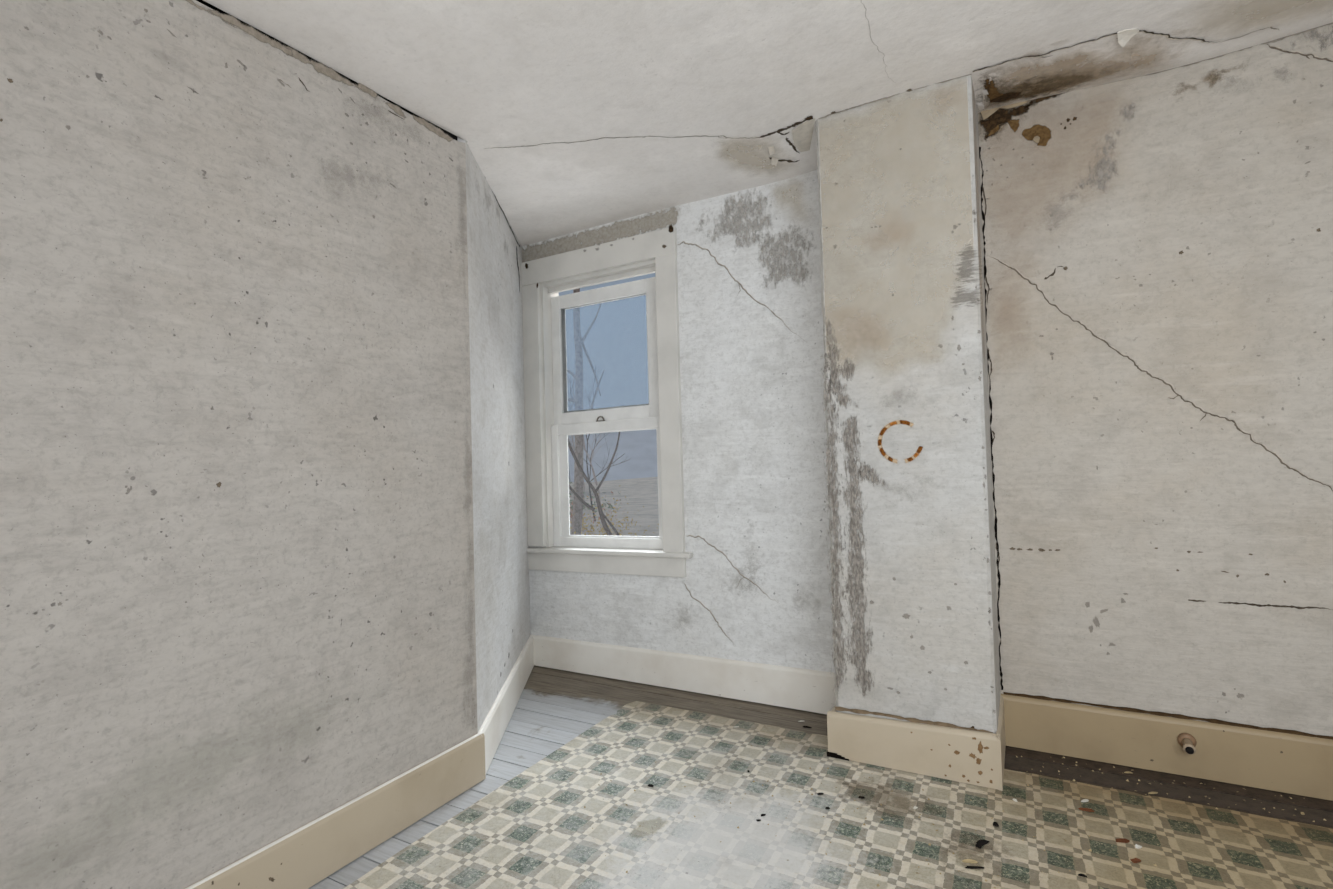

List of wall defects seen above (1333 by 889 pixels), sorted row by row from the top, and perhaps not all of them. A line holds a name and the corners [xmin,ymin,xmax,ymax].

crack [818,2,1333,119]
water stain [1007,48,1156,98]
crack [485,136,758,149]
flaking render [979,79,1066,146]
crack [679,241,808,343]
rust [878,420,923,462]
crack [979,147,1333,740]
crack [685,535,772,600]
crack [683,582,734,644]